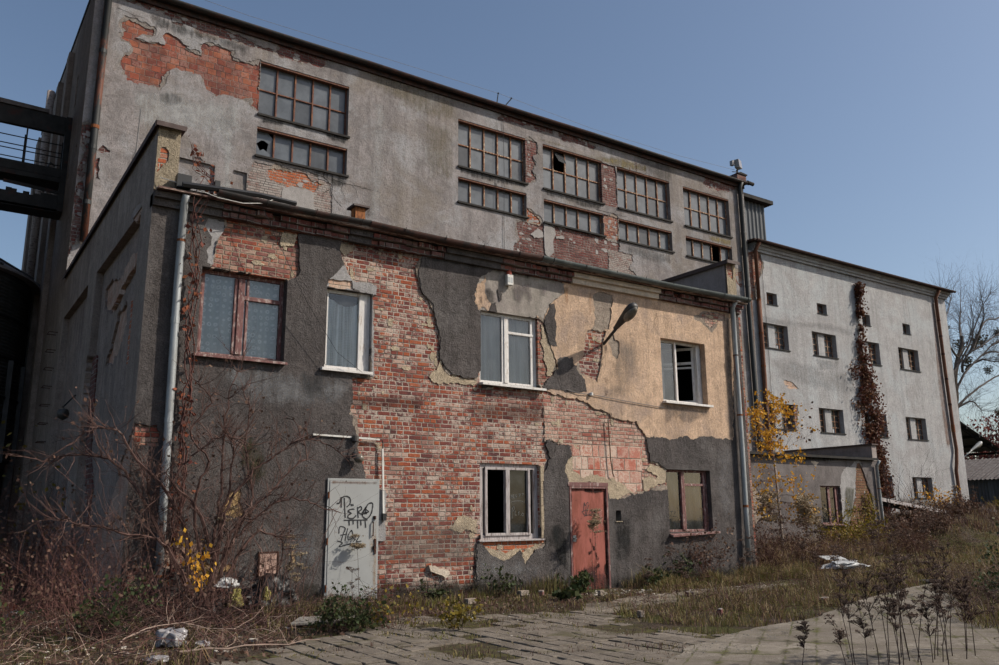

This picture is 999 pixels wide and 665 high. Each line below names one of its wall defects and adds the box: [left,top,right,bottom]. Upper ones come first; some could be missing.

flaking render [118,0,328,112]
flaking render [205,218,300,282]
flaking render [246,161,332,213]
flaking render [497,114,596,184]
flaking render [513,162,636,275]
flaking render [327,242,667,601]
flaking render [825,460,873,544]